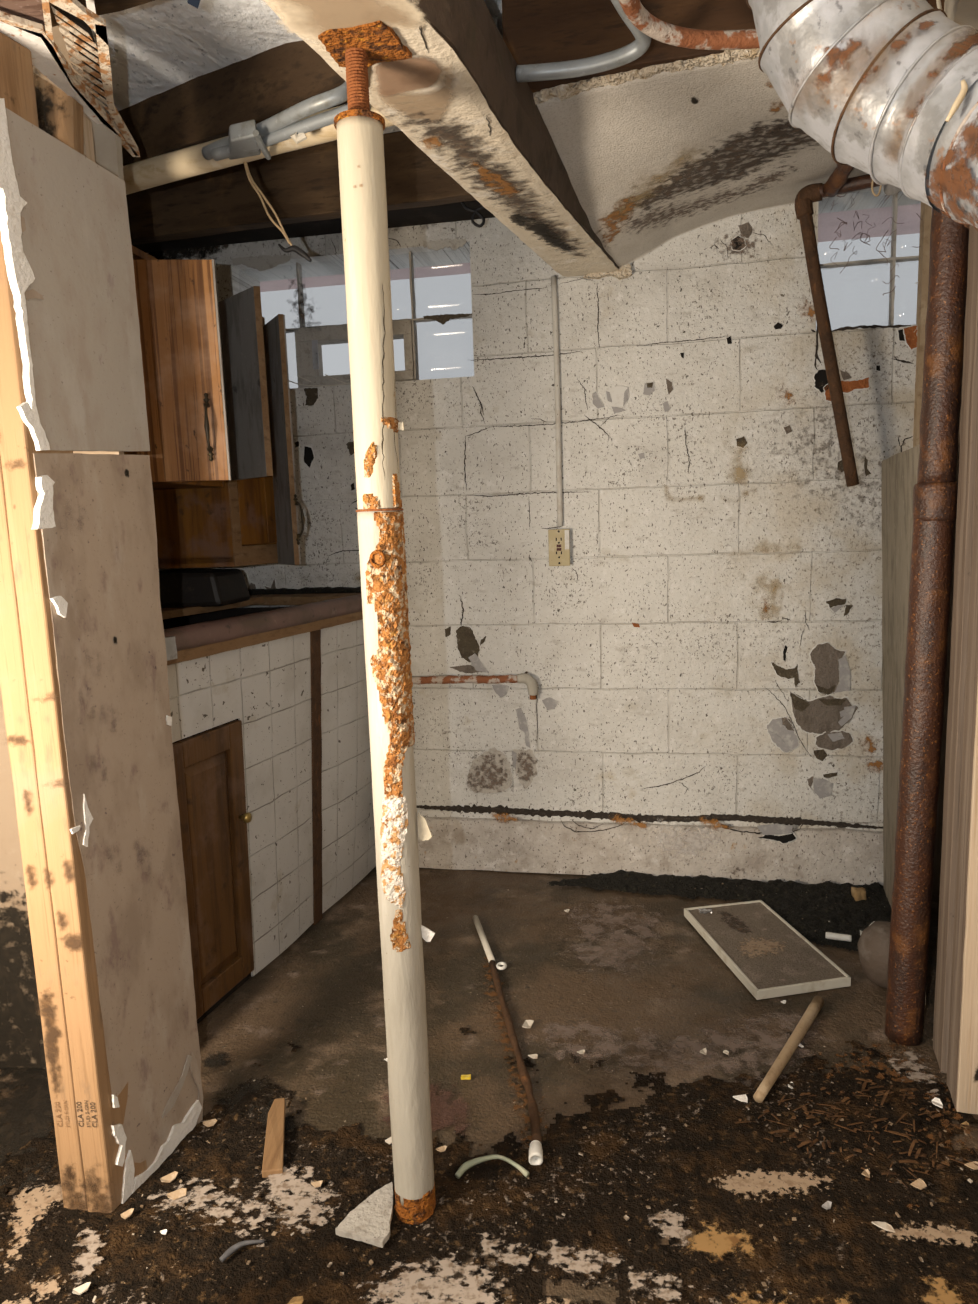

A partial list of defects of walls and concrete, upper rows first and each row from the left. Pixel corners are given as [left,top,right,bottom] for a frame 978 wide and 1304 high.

leakage [375,58,586,257]
leakage [619,119,818,233]
spalling [729,222,753,251]
spalling [295,441,315,468]
rust [369,550,386,568]
peeling [445,625,539,795]
leakage [467,747,538,792]
peeling [766,642,859,799]